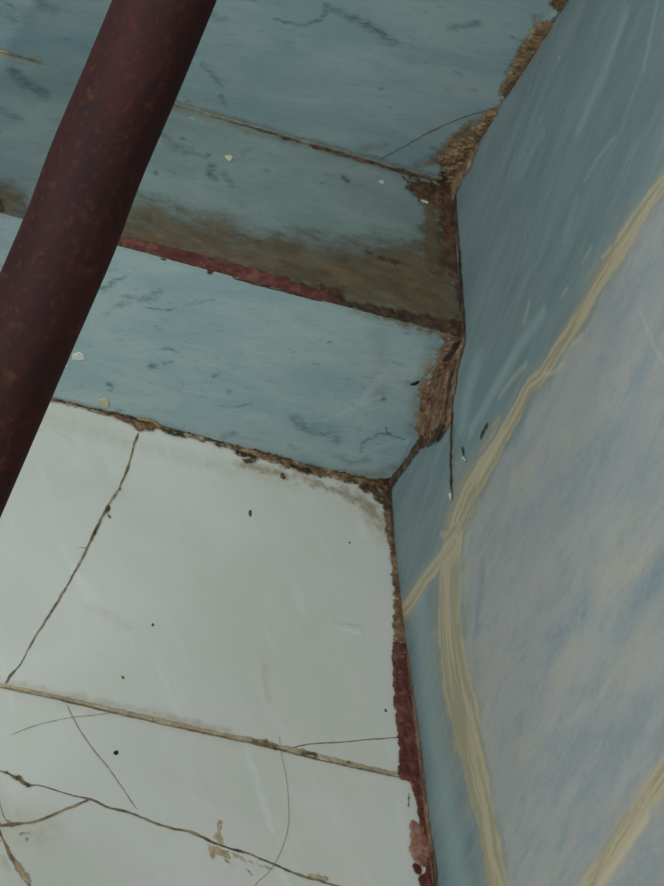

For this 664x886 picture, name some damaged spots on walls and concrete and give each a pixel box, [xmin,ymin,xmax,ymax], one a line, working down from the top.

spalling [493,0,569,112]
leakage [118,206,460,333]
crack [0,433,399,886]
peeling [392,614,437,886]